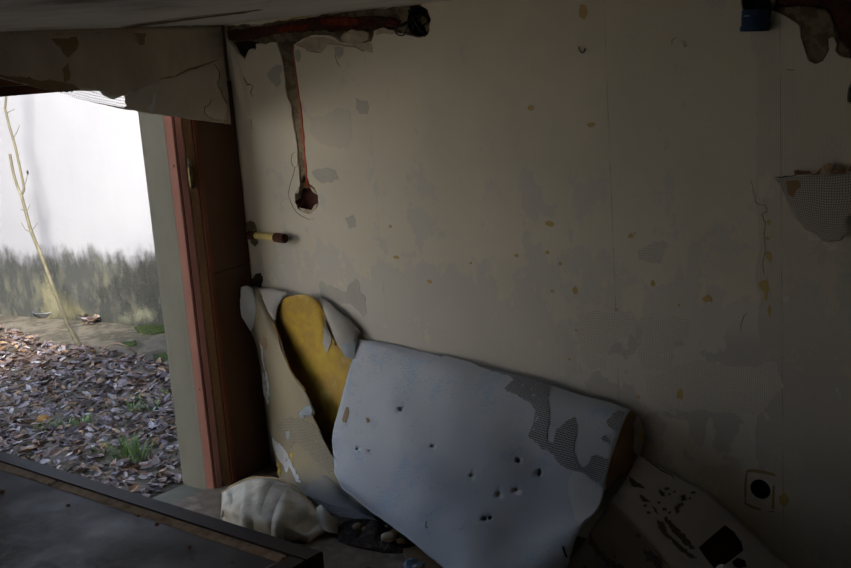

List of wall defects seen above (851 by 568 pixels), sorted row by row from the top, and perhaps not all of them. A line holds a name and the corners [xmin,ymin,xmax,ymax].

flaking render [227,16,401,41]
peeling [775,163,851,242]